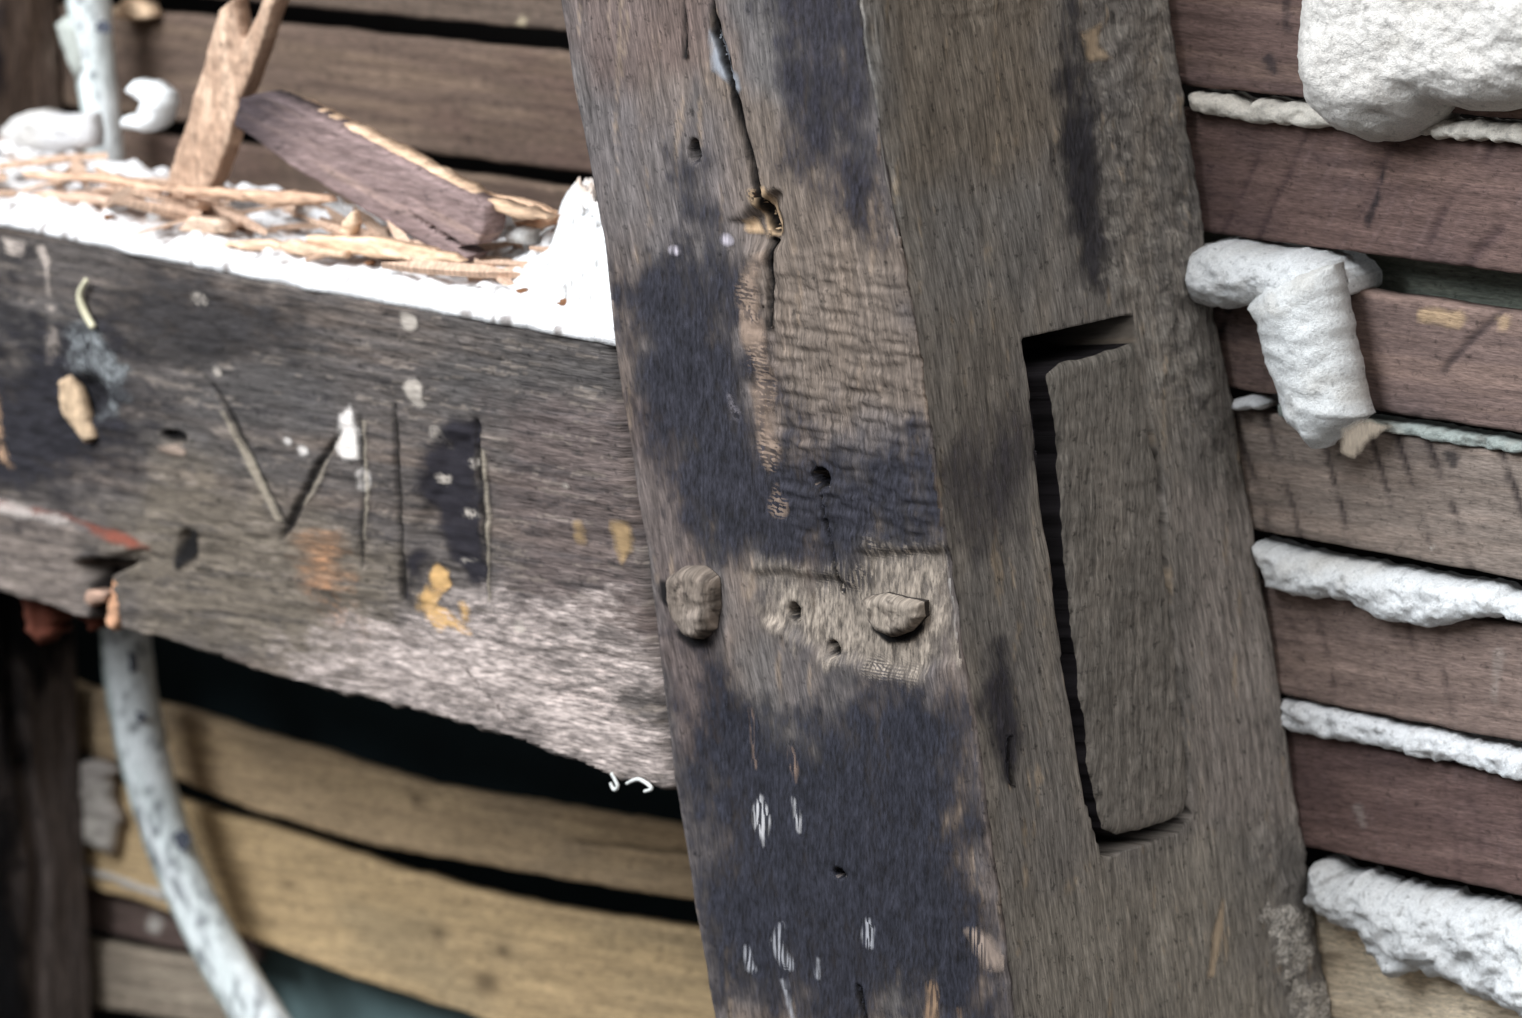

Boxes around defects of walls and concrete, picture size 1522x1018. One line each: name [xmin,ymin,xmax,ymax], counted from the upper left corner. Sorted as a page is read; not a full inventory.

crack [682,0,782,330]
water stain [417,420,488,584]
water stain [611,156,1020,589]
water stain [311,598,1021,1018]
crack [856,984,868,1018]